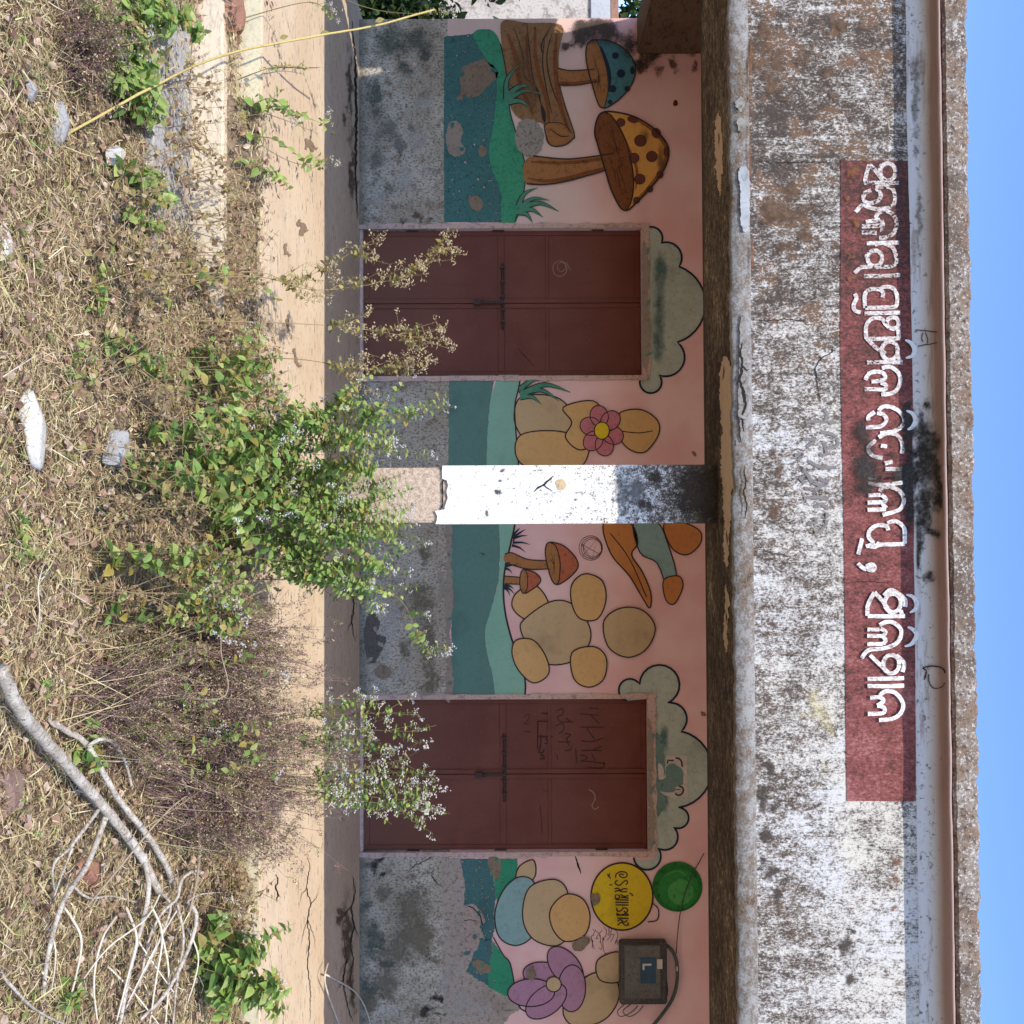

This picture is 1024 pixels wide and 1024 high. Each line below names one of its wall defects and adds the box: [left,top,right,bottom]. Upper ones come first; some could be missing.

damp [561,18,676,75]
peeling [457,59,498,101]
peeling [446,120,465,157]
damp [616,469,663,514]
damp [671,467,718,520]
damp [851,401,943,582]
crack [339,878,358,1022]
flaking render [442,857,520,1024]